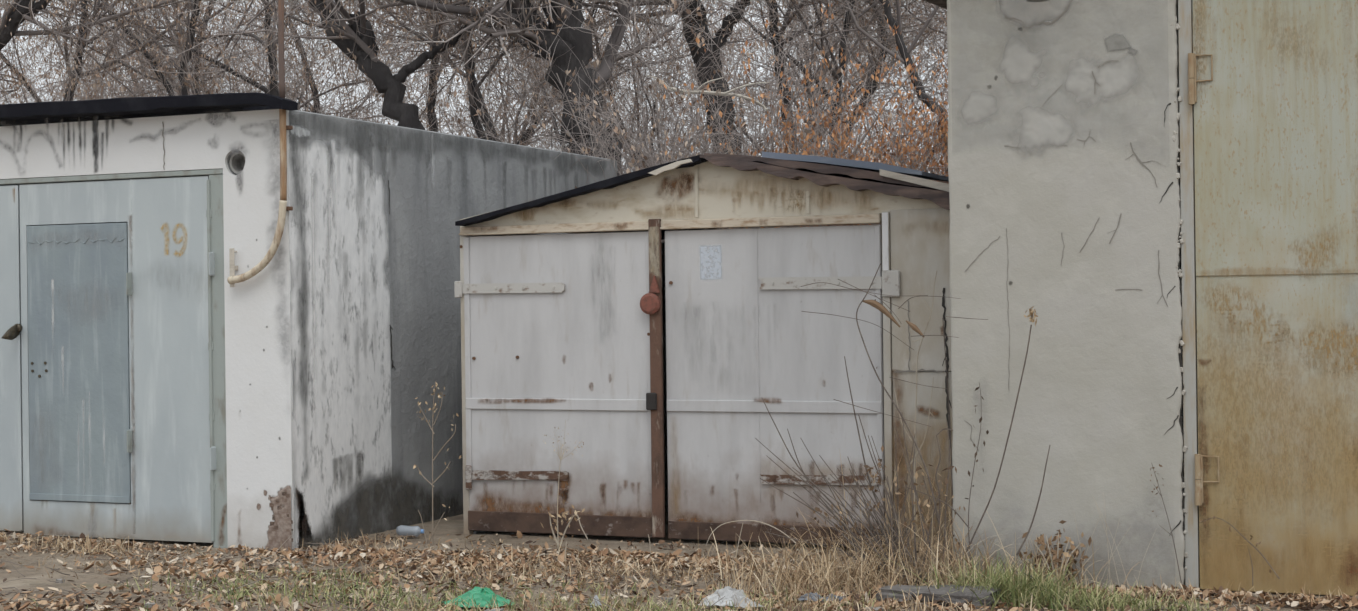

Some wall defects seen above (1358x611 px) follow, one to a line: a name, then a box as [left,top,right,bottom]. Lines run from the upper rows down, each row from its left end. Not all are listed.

water stain [289,110,336,238]
peeling [257,137,392,551]
water stain [306,474,463,548]
corrosion [479,481,650,517]